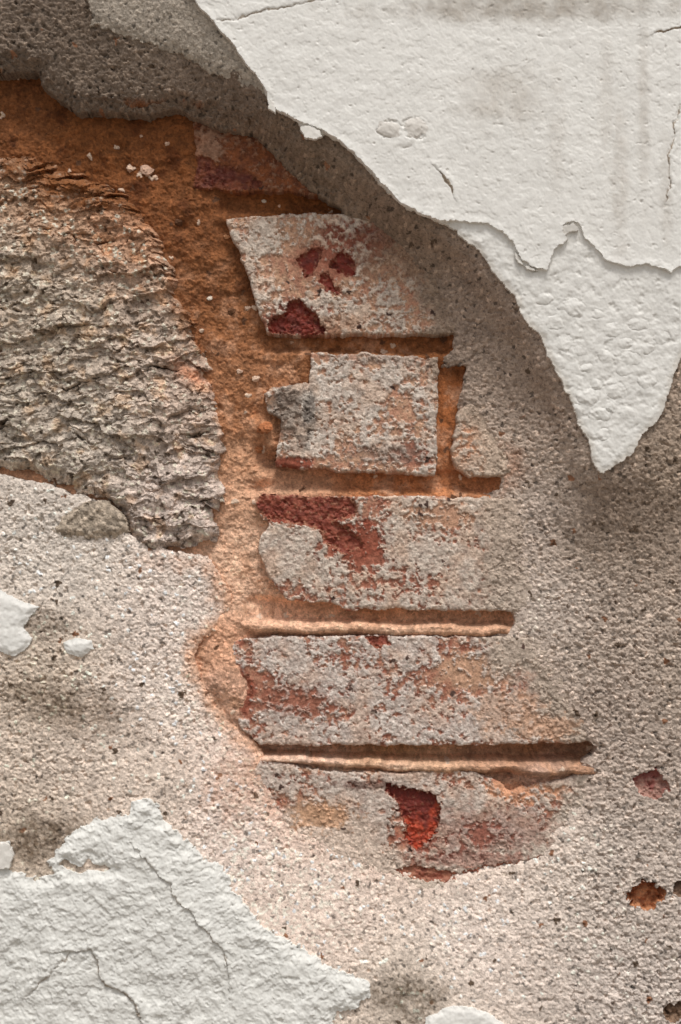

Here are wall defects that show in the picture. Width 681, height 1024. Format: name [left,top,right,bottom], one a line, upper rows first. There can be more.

crack [665,109,680,203]
peeling [86,0,681,474]
spalling [256,494,364,554]
peeling [0,590,40,657]
peeling [63,638,94,657]
spalling [365,636,391,649]
spalling [385,783,442,850]
spalling [633,767,671,800]
crack [144,858,228,967]
spalling [396,855,542,883]
spalling [623,879,681,911]
crack [37,949,142,1022]